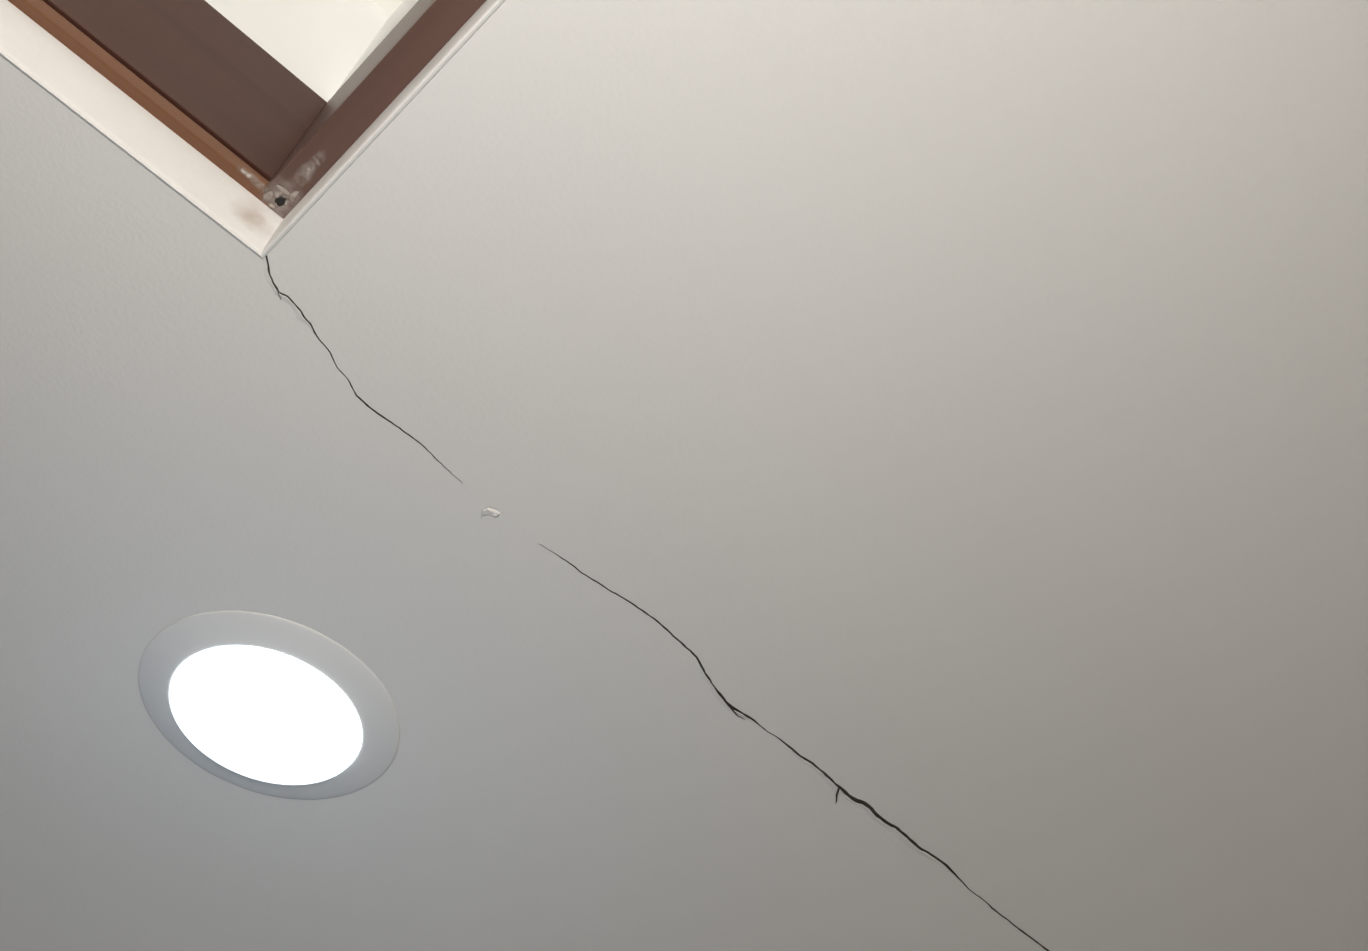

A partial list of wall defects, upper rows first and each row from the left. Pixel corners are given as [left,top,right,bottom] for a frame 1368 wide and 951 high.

crack [264,255,459,480]
crack [481,507,503,518]
crack [540,544,1050,951]